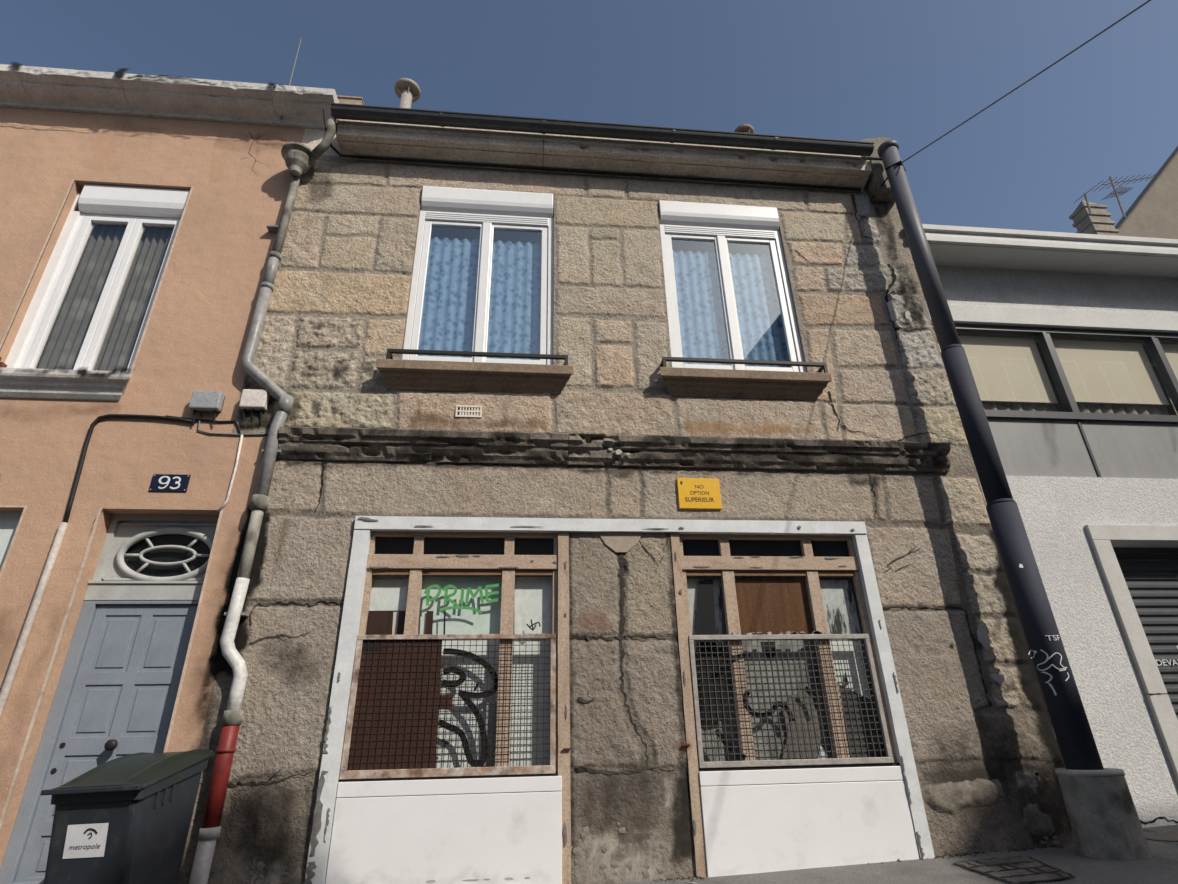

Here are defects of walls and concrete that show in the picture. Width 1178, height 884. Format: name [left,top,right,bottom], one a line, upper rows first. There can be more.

crack [851,194,924,355]
damp [877,202,923,322]
crack [828,391,956,441]
damp [198,507,270,750]
crack [570,537,680,775]
flaking render [215,770,330,884]